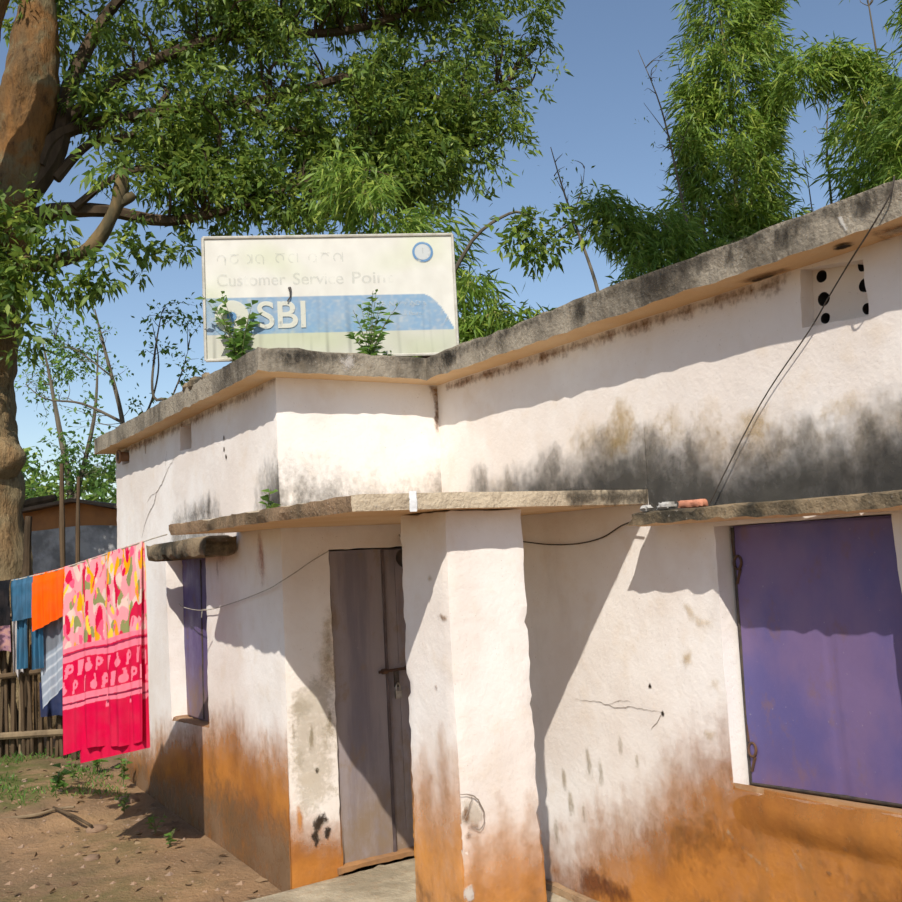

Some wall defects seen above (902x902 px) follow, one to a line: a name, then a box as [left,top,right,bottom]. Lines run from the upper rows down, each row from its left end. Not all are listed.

damp [855,195,871,217]
damp [511,419,902,511]
crack [582,700,661,727]